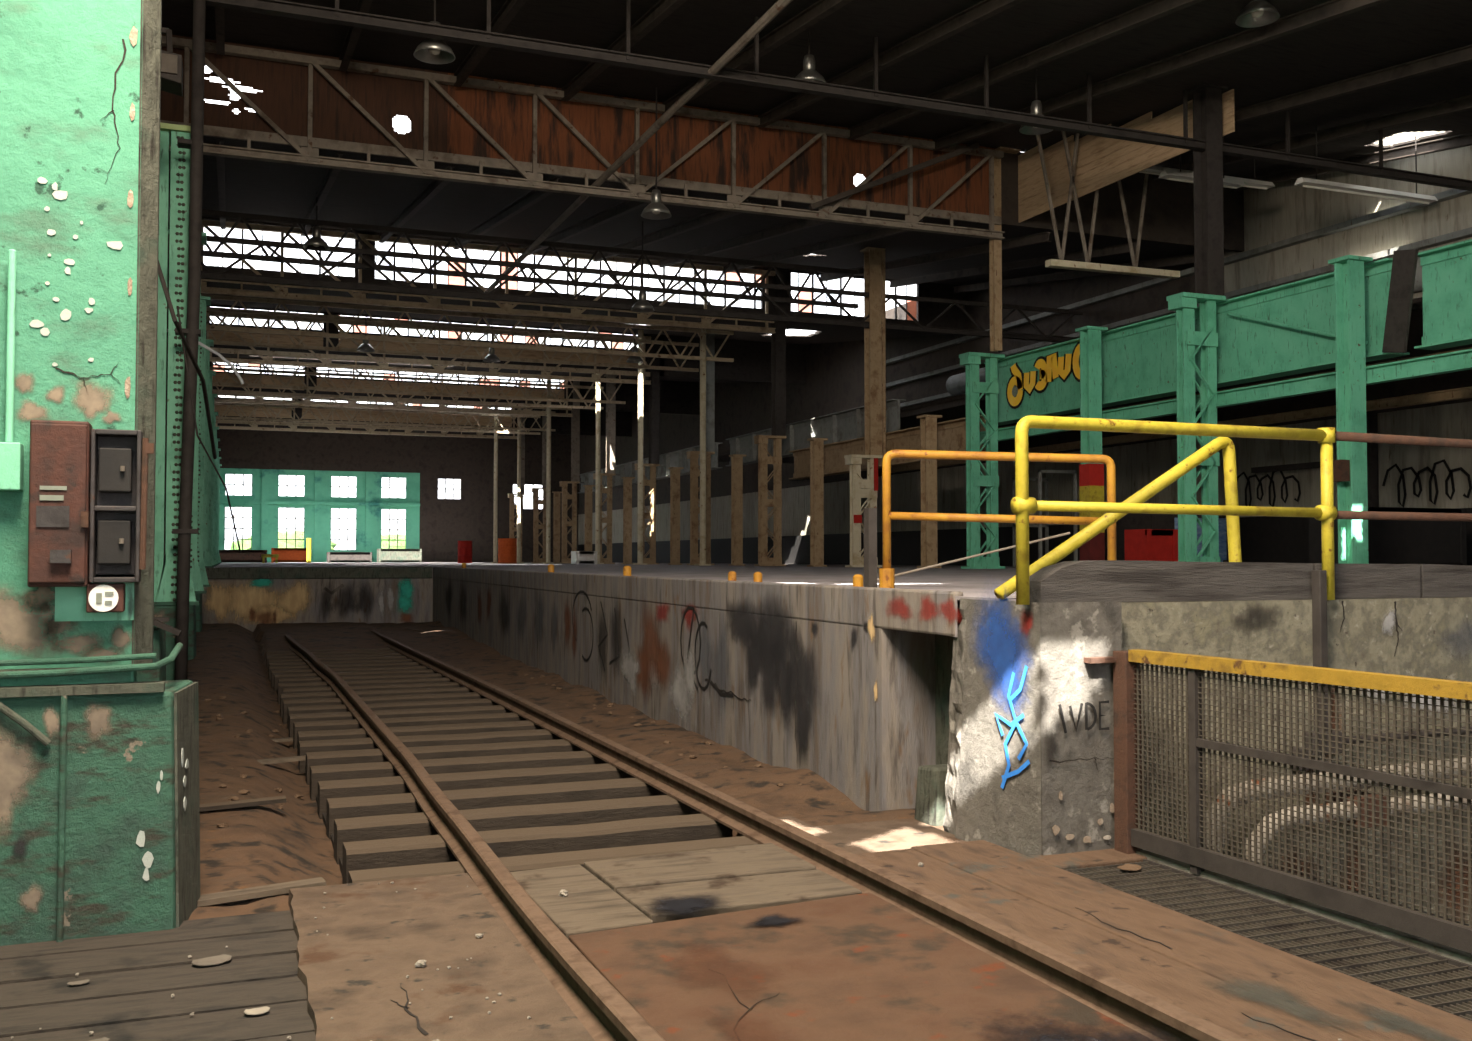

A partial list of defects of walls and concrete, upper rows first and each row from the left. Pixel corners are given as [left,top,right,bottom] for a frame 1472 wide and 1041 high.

spalling [129,26,138,47]
crack [103,39,127,183]
peeling [37,177,68,211]
peeling [107,241,123,250]
peeling [29,281,95,336]
spalling [15,374,131,423]
spalling [44,708,59,735]
spalling [86,705,111,739]
spalling [0,730,32,827]
peeling [181,748,189,811]
peeling [136,831,154,881]
crack [1241,1012,1317,1041]